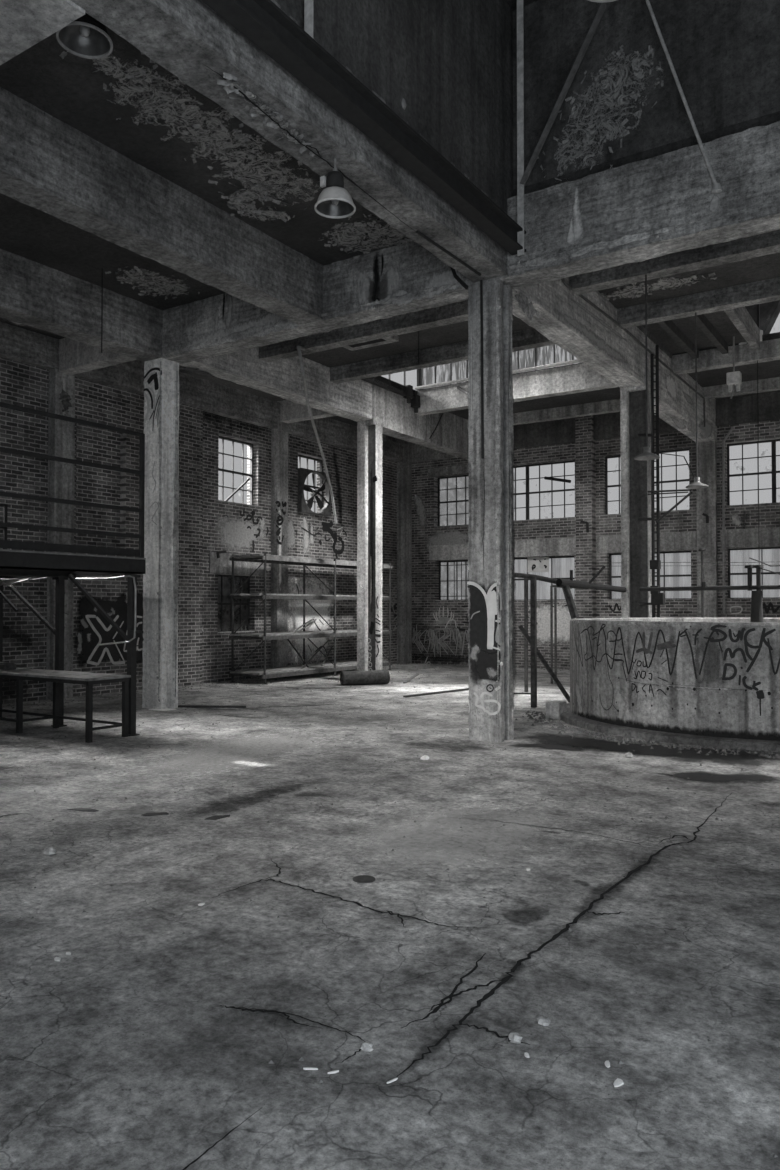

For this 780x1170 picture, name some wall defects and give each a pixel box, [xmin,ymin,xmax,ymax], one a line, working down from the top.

peeling [93,51,322,222]
peeling [105,266,200,300]
peeling [320,214,412,259]
crack [215,794,731,1078]